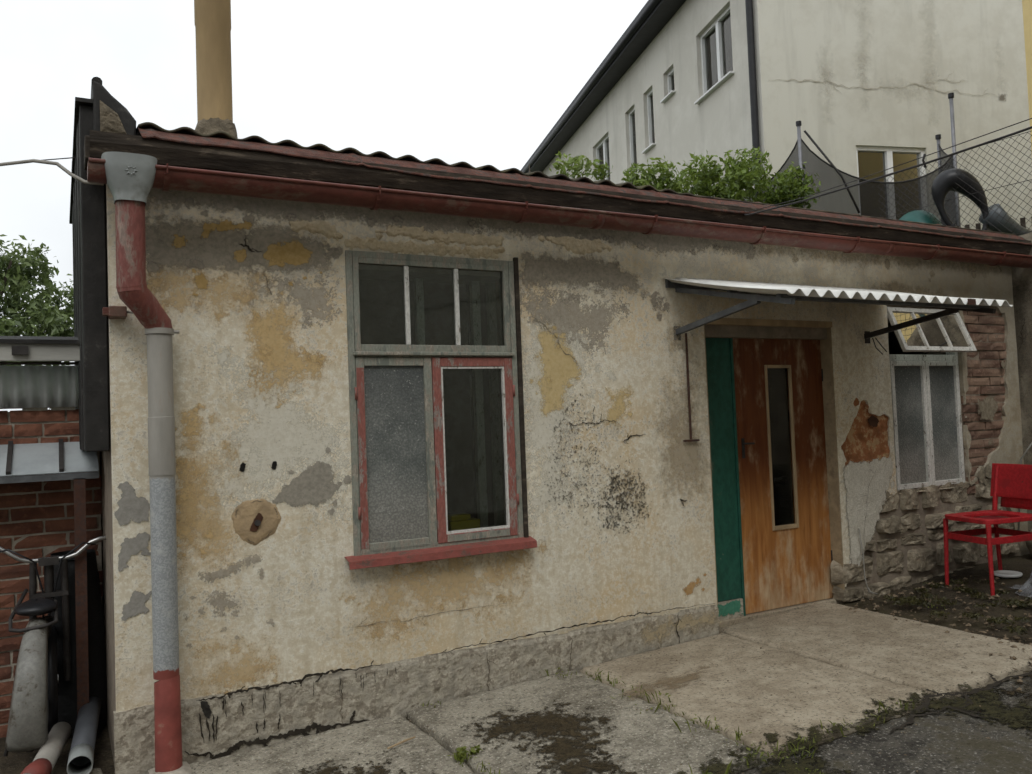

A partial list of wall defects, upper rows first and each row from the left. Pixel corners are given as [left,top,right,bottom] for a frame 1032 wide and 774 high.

crack [773,71,998,96]
peeling [145,215,505,396]
crack [526,316,580,368]
peeling [519,285,630,415]
water stain [522,317,658,538]
crack [569,406,642,444]
spalling [841,398,890,467]
peeling [176,456,214,558]
peeling [272,447,351,515]
peeling [190,554,264,639]
crack [185,660,380,759]